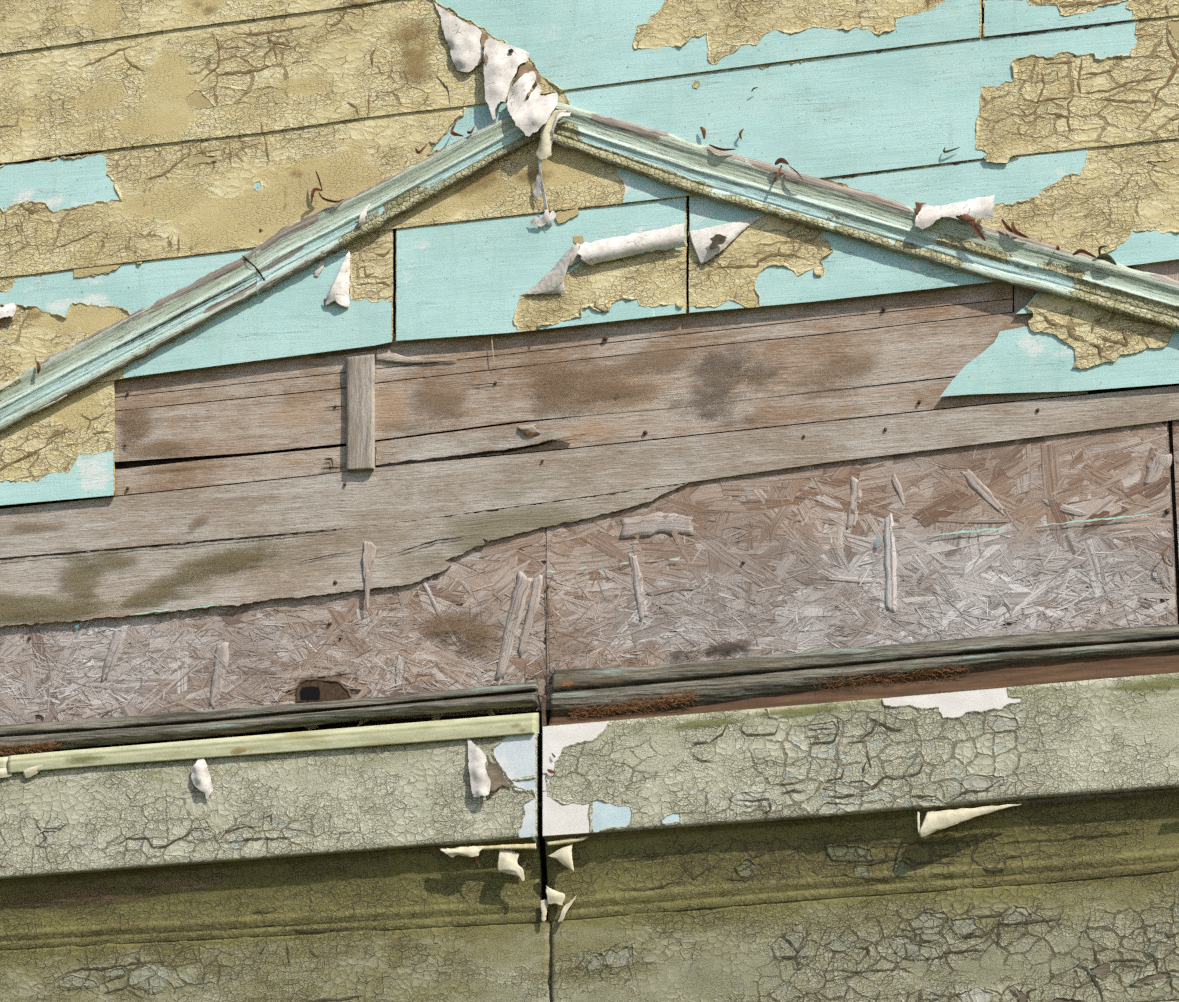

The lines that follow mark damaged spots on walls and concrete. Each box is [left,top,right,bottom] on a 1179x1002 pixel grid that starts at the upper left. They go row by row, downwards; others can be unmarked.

crack [199,2,373,82]
peeling [426,0,1139,218]
peeling [122,167,771,378]
peeling [536,229,997,330]
peeling [0,448,113,505]
crack [92,814,295,851]
peeling [467,721,634,850]
crack [692,721,781,762]
crack [732,715,1002,814]
peeling [881,687,1023,732]
crack [777,903,1063,1002]
crack [1071,930,1179,1002]